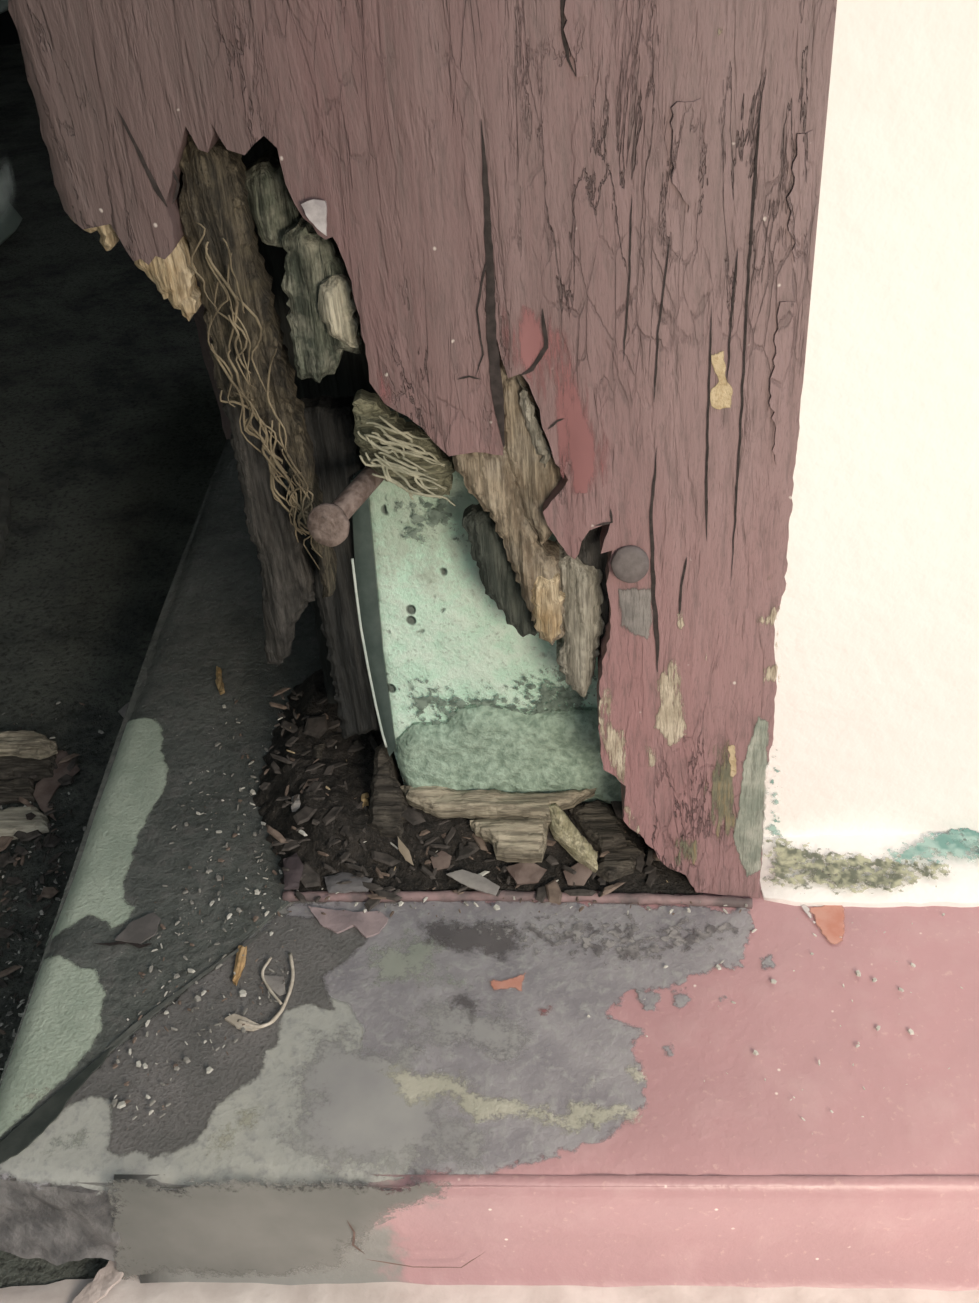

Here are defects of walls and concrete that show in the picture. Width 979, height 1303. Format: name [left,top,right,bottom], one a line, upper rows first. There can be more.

crack [561,0,576,76]
peeling [564,0,602,77]
crack [117,109,180,207]
peeling [301,199,327,236]
crack [457,120,548,447]
crack [624,203,670,400]
peeling [502,306,607,494]
crack [649,94,762,672]
peeling [619,588,652,639]
peeling [654,660,686,746]
mould [763,756,979,895]
peeling [263,853,755,1190]